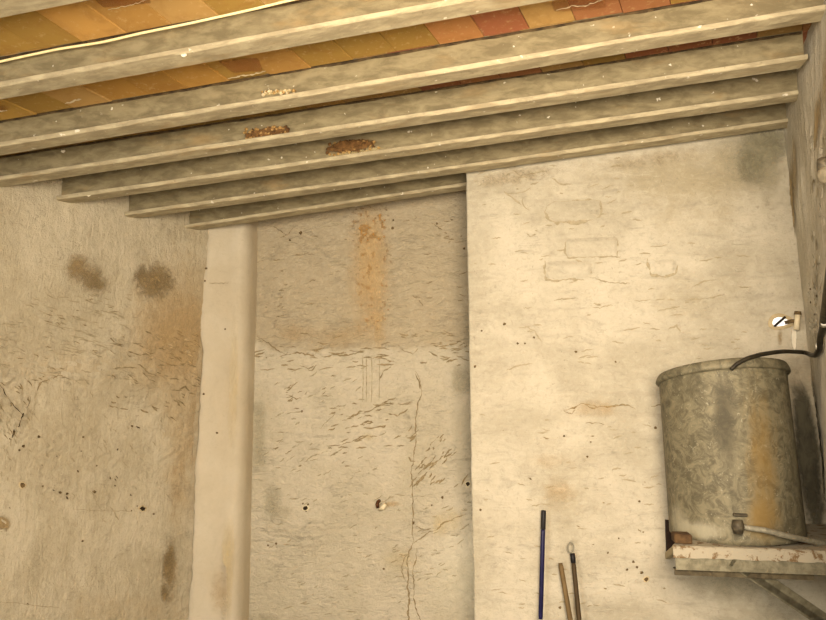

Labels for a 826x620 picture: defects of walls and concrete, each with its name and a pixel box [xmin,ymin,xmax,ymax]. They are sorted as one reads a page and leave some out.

spalling [243,125,290,139]
spalling [326,139,380,156]
water stain [68,257,104,289]
crack [401,371,463,620]